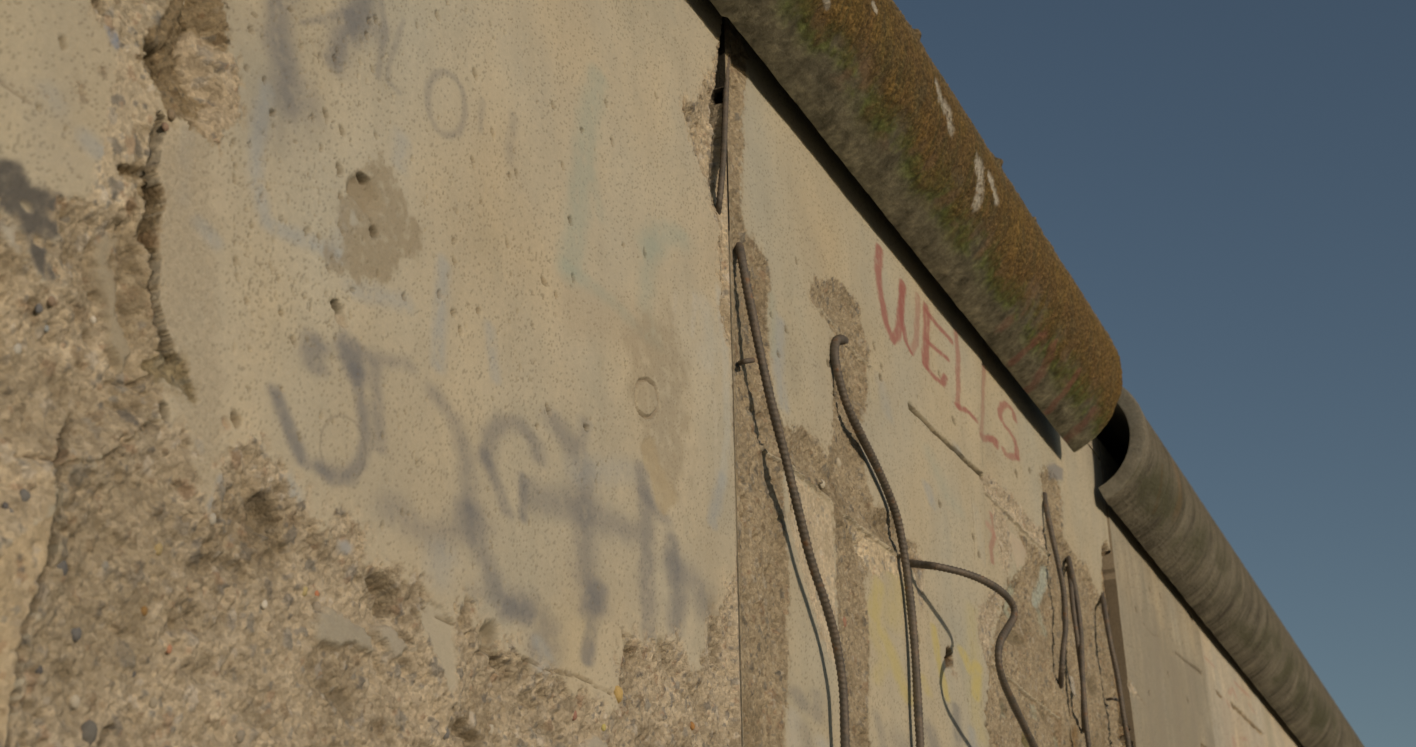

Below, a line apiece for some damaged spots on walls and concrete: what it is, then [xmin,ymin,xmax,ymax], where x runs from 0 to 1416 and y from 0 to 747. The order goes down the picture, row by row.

spalling [6,21,1138,747]